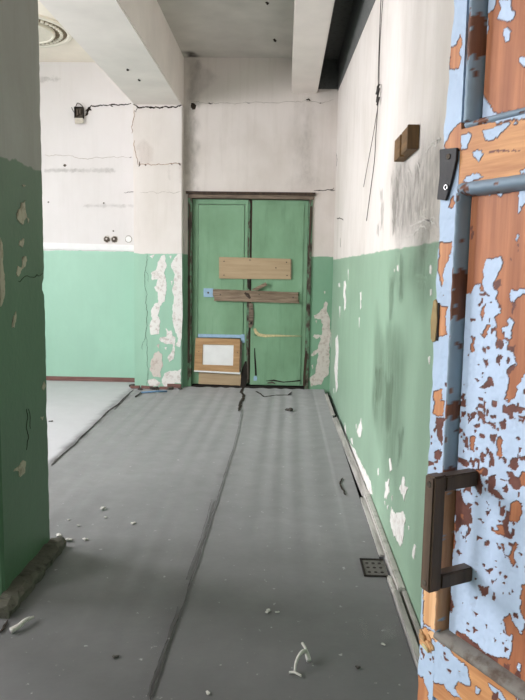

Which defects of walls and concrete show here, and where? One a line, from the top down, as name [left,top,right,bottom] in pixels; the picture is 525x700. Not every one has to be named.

crack [50,98,331,166]
peeling [148,204,191,387]
crack [51,261,148,465]
peeling [303,302,339,392]
crack [147,387,292,699]
peeling [345,420,379,495]
peeling [384,458,409,547]